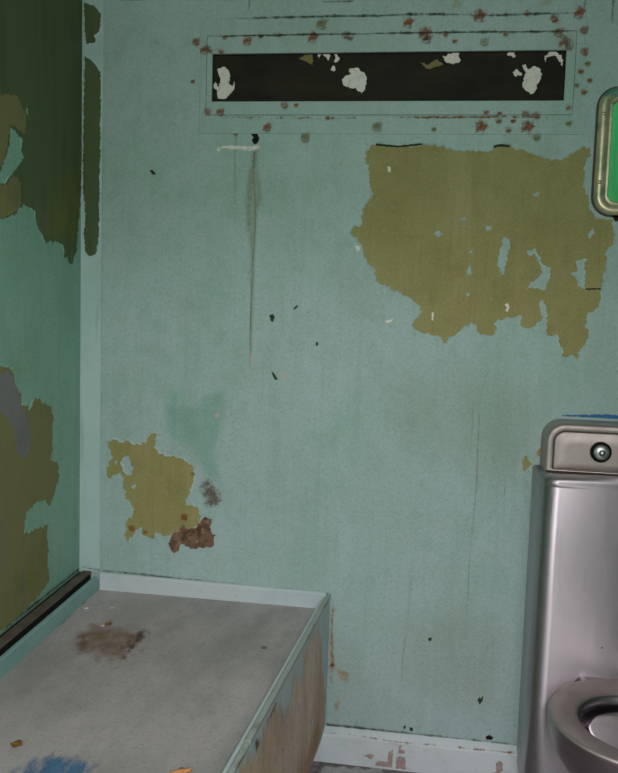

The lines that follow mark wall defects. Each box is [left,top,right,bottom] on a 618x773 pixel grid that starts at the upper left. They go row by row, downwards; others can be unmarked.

rust [403,17,433,44]
rust [550,15,593,95]
rust [573,6,589,36]
peeling [0,0,103,266]
rust [204,103,356,133]
rust [401,109,549,142]
peeling [349,142,617,361]
peeling [0,364,59,633]
peeling [106,433,216,554]
damp [72,619,151,667]
rust [239,607,349,773]
peeling [364,745,407,770]